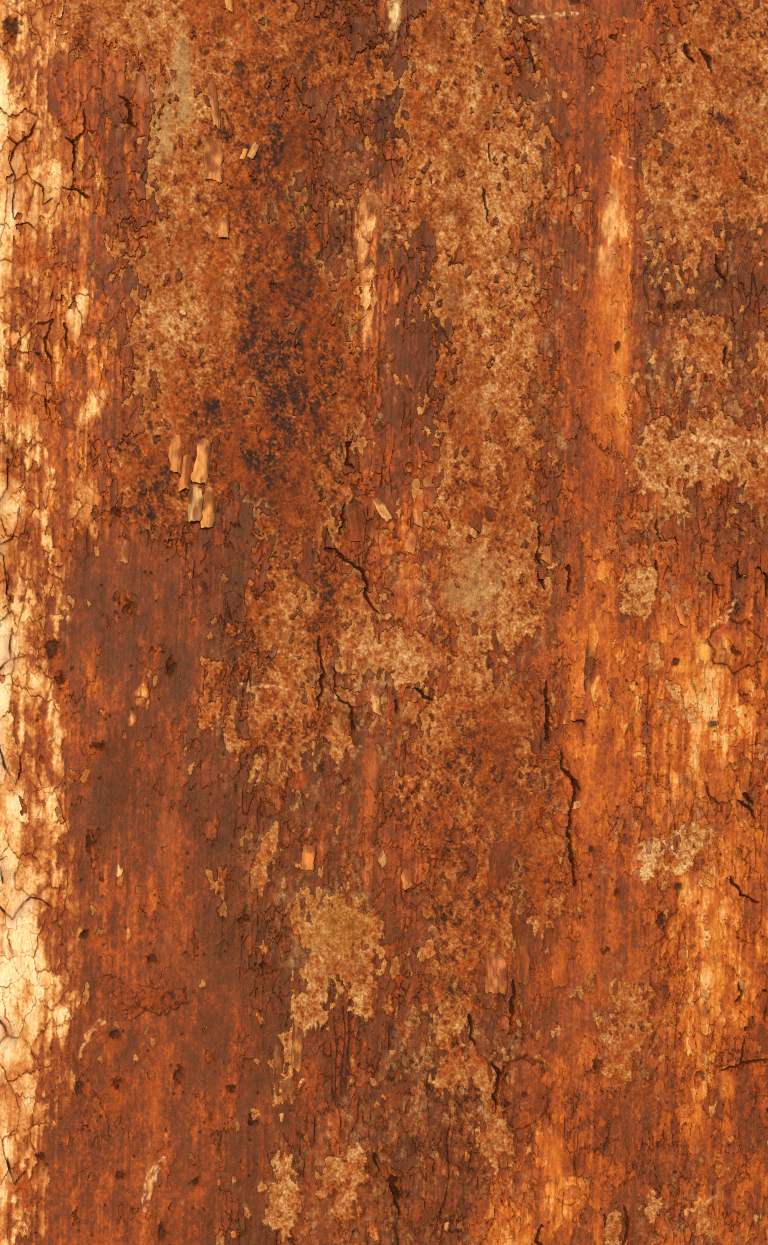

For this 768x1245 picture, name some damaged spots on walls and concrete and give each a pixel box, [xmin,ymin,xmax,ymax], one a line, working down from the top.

rust [638,255,700,297]
peeling [619,0,768,551]
rust [612,349,765,425]
crack [0,459,27,672]
peeling [55,0,595,1180]
crack [0,744,23,786]
crack [0,857,52,921]
rust [267,769,368,889]
peeling [632,815,715,893]
crack [737,793,757,820]
rust [381,937,437,1084]
peeling [264,1143,390,1242]